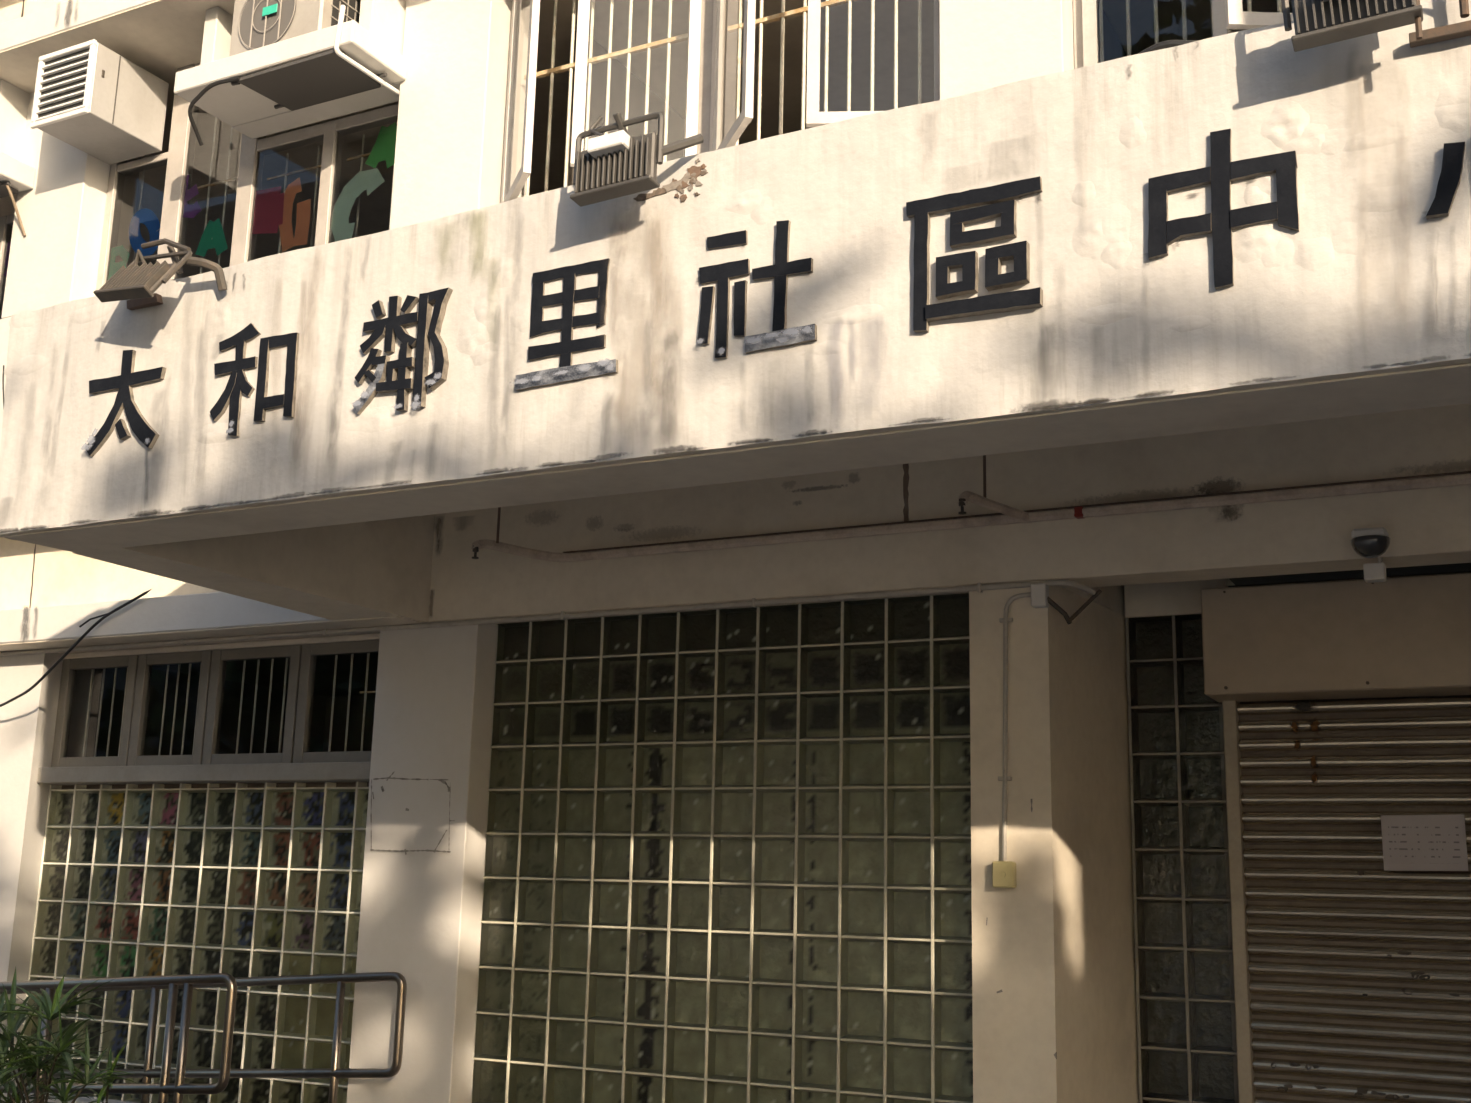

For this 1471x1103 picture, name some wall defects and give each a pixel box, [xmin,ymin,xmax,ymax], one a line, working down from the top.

leakage [1027,400,1059,410]